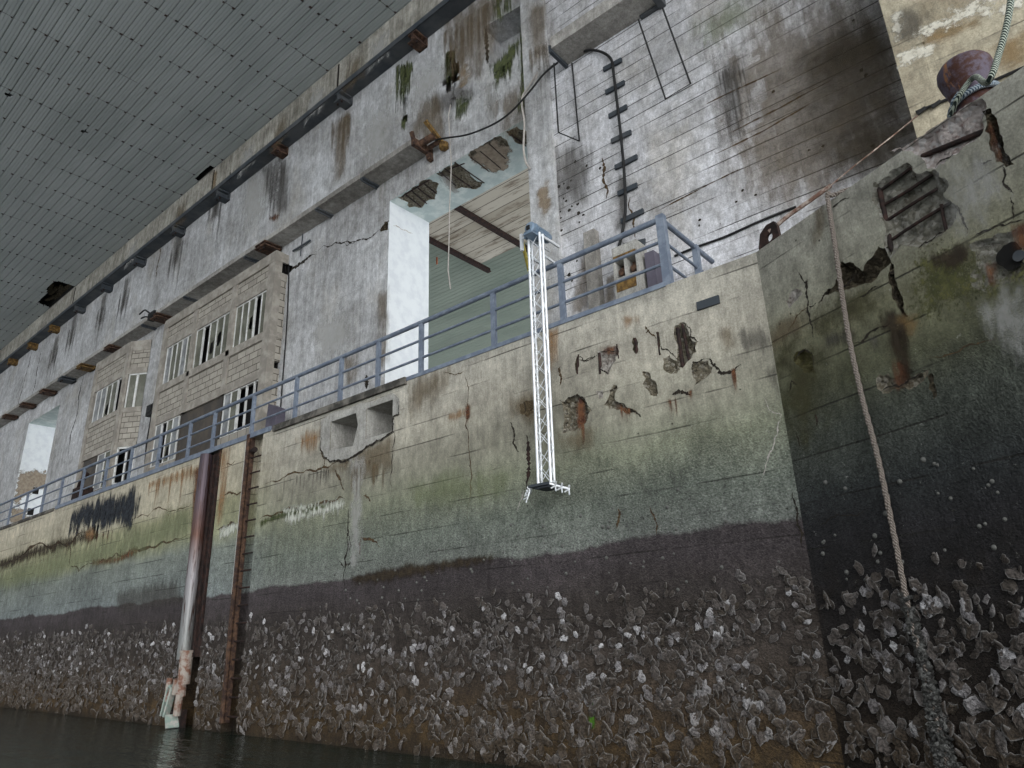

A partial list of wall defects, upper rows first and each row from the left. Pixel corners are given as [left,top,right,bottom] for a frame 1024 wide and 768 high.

water stain [395,62,413,114]
water stain [494,60,512,90]
peeling [398,127,527,208]
spalling [819,99,1024,317]
crack [290,225,411,272]
spalling [559,344,641,433]
spalling [643,371,658,396]
spalling [656,322,712,385]
rust [882,312,911,376]
crack [261,399,399,588]
water stain [0,496,132,570]